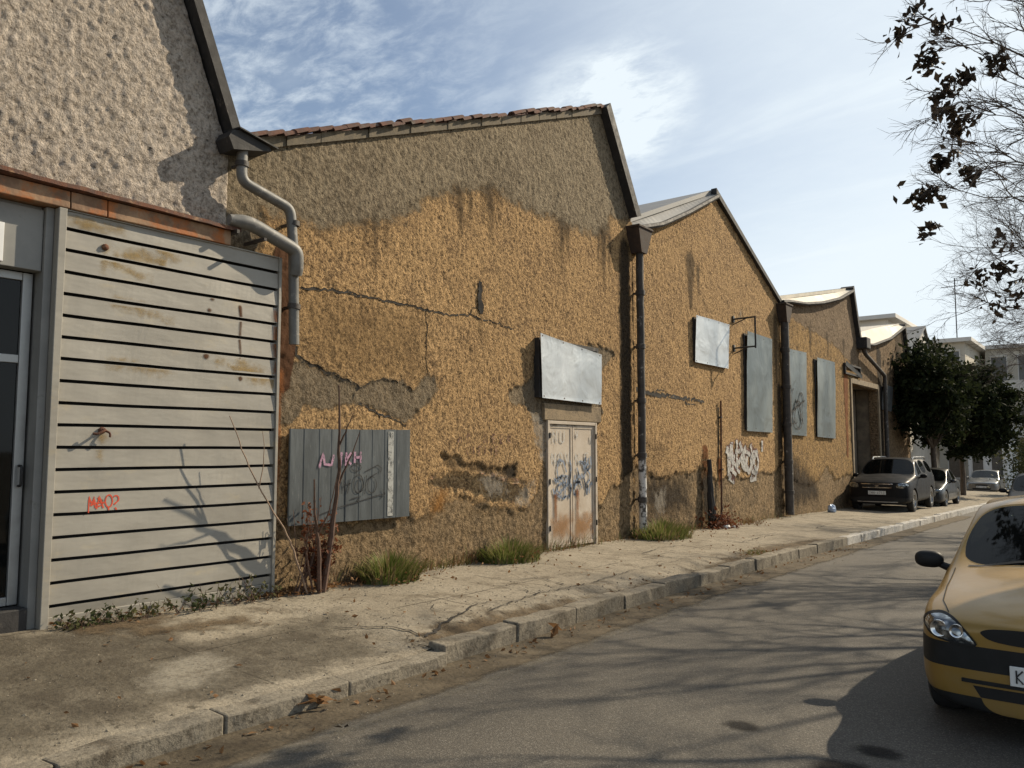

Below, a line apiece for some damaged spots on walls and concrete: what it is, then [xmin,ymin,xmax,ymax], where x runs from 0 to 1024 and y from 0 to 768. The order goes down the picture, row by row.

rust [238,247,295,485]
crack [295,286,512,426]
spalling [274,461,547,590]
rust [554,490,592,535]